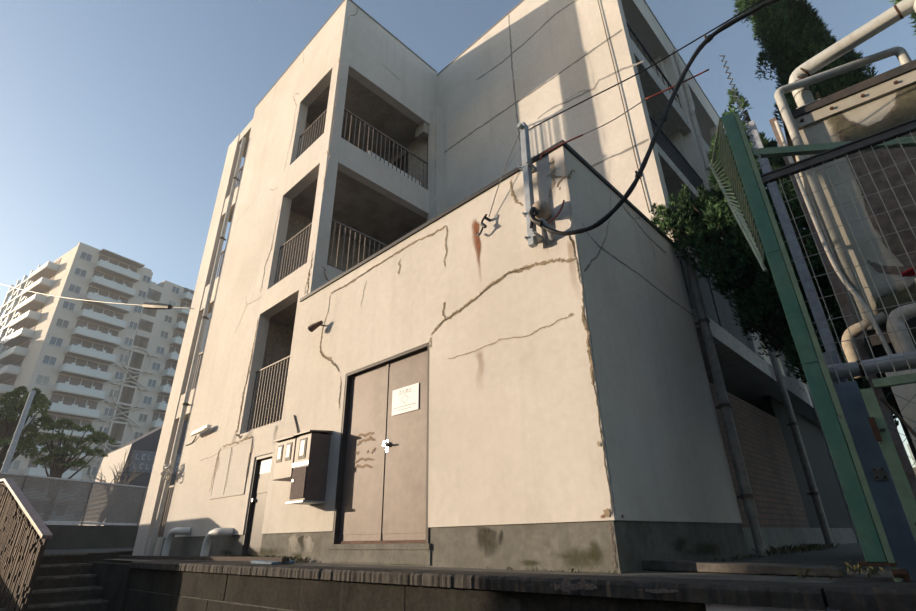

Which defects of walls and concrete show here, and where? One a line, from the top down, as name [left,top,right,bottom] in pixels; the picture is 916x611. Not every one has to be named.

crack [434,0,649,206]
crack [202,213,279,460]
crack [304,225,448,409]
crack [429,194,696,568]
water stain [478,528,502,551]